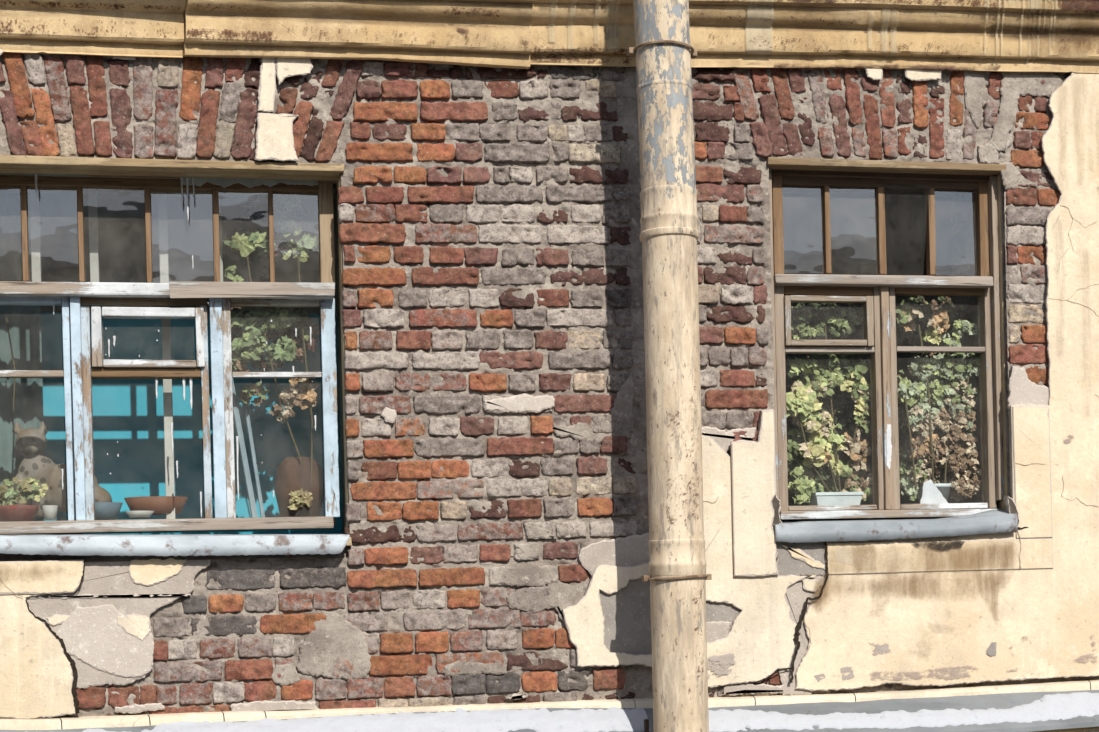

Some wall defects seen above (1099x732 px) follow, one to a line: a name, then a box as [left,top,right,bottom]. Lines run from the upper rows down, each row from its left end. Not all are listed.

rust [0,0,245,37]
rust [187,26,352,42]
rust [367,7,631,63]
rust [774,41,974,71]
flaking render [691,68,1065,456]
flaking render [0,52,653,725]
leakage [913,540,965,551]
crack [756,544,829,683]
flaking render [706,541,1099,700]